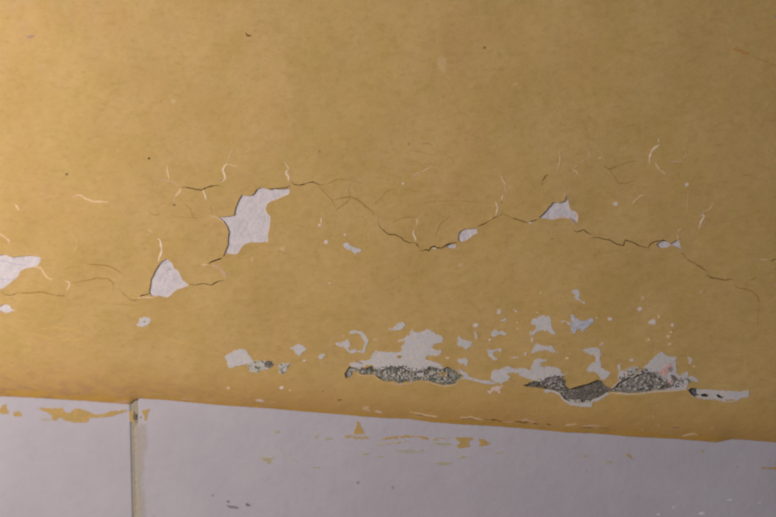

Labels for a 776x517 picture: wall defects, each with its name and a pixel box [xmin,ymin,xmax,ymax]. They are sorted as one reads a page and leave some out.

crack [541,138,686,204]
crack [148,149,237,262]
peeling [210,187,290,263]
crack [284,161,538,251]
peeling [529,191,578,224]
peeling [0,255,52,289]
crack [6,264,149,297]
peeling [139,259,188,298]
crack [190,264,226,285]
crack [577,229,774,300]
peeling [225,349,291,374]
peeling [335,312,749,407]